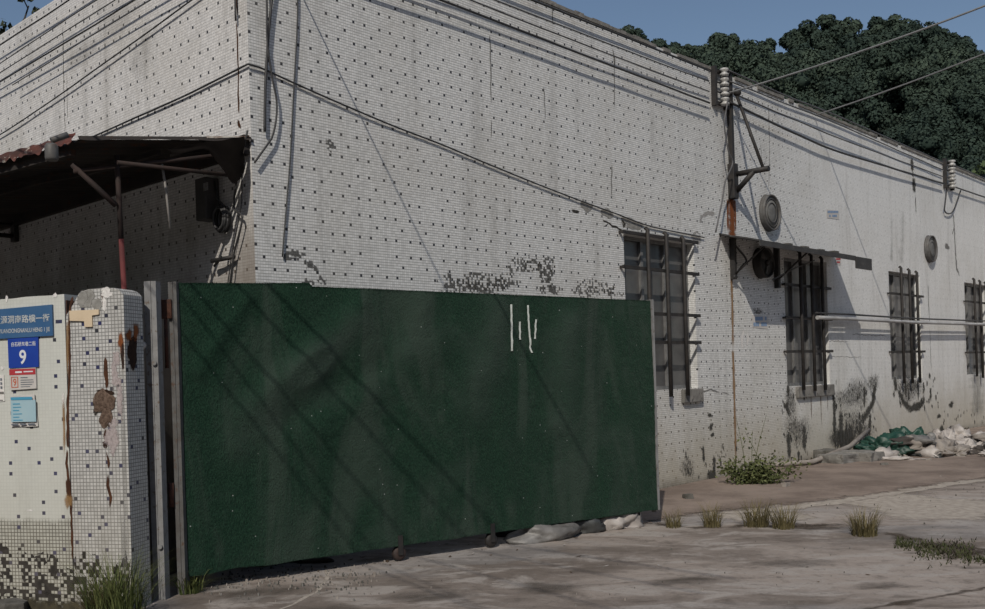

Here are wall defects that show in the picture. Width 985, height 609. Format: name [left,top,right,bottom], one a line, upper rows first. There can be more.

peeling [437,255,560,295]
peeling [573,278,624,299]
corrosion [118,324,139,371]
spalling [93,388,115,429]
water stain [782,376,879,460]
water stain [893,373,984,431]
peeling [0,542,130,605]